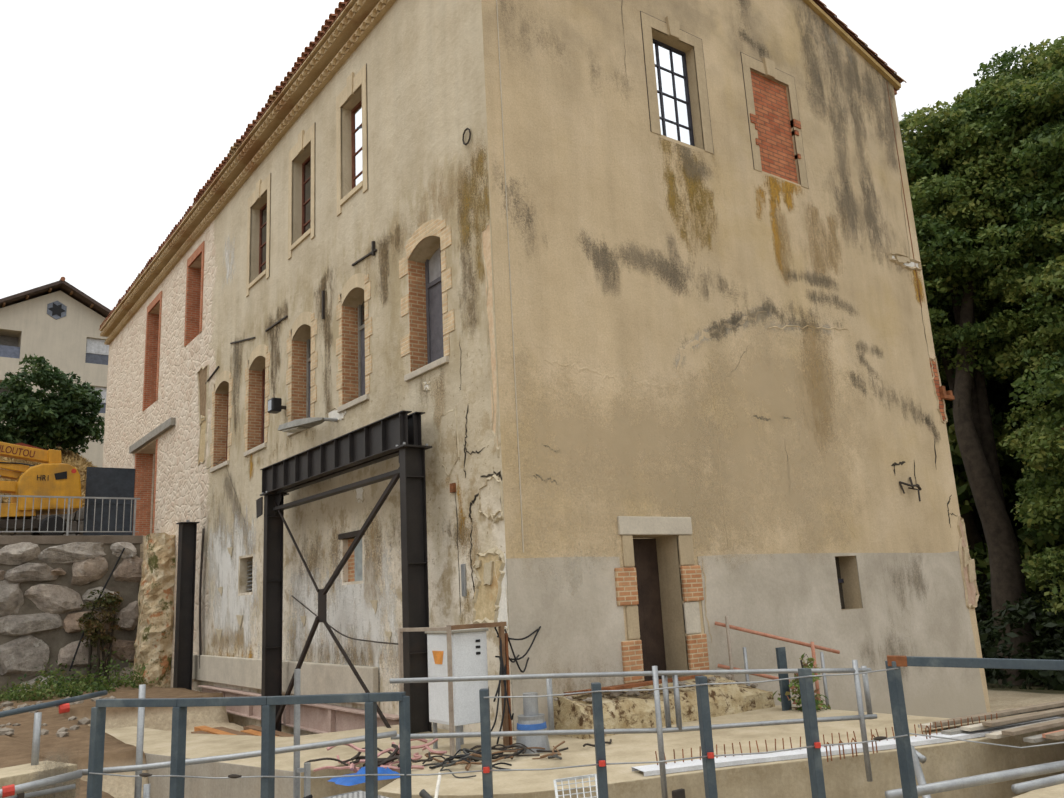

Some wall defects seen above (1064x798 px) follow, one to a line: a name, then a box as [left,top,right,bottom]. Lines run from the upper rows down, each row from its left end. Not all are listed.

mould [438,154,490,324]
damp [583,146,711,289]
damp [778,23,878,306]
flaking render [929,356,948,424]
crack [455,343,503,611]
crack [533,474,558,485]
crack [891,440,937,488]
spalling [957,516,979,609]